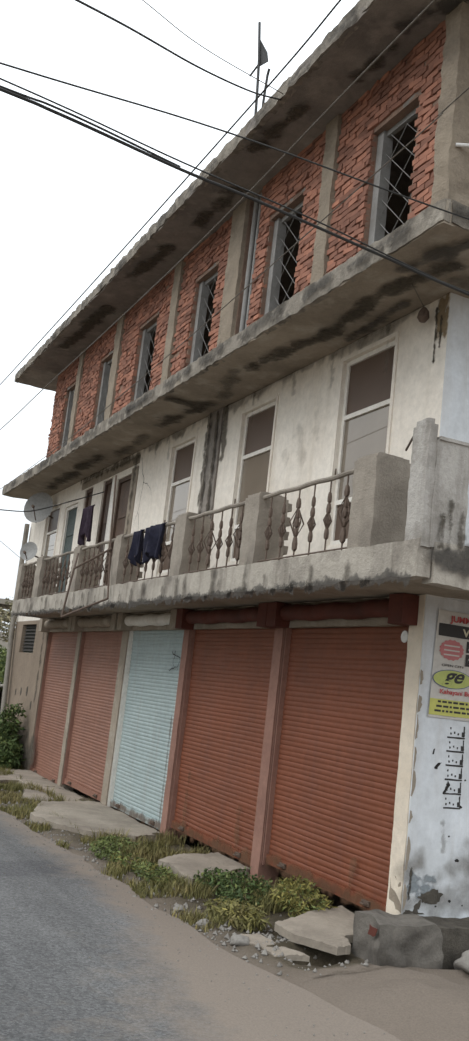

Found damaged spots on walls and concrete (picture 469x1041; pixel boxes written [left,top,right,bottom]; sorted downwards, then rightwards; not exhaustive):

leakage [349,0,469,82]
leakage [247,107,309,153]
leakage [115,246,176,277]
leakage [33,299,115,358]
leakage [155,242,469,514]
leakage [46,436,160,503]
leakage [430,500,469,577]
flaking render [411,670,423,796]
flaking render [389,836,463,914]